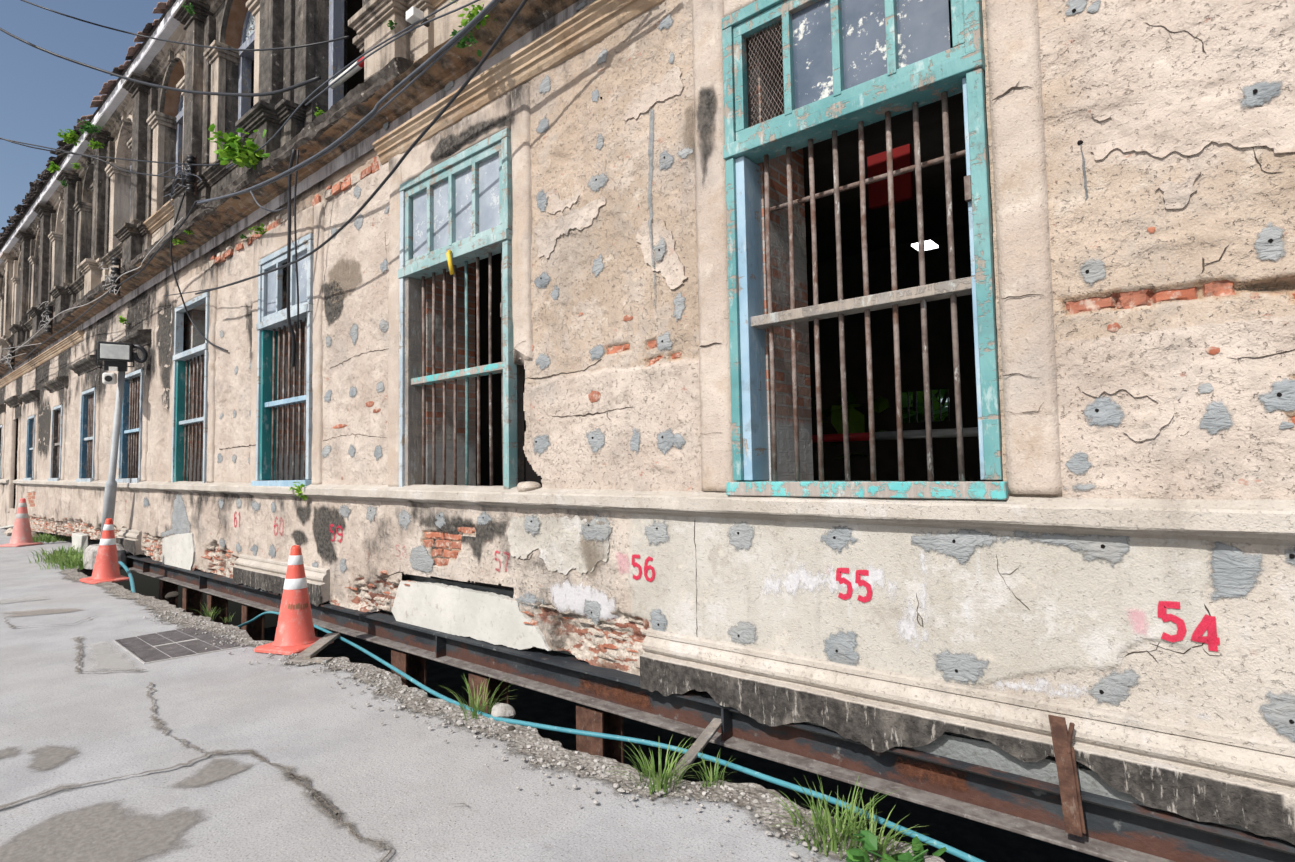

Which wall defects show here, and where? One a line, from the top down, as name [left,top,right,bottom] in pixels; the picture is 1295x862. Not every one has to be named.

water stain [685,88,716,174]
water stain [322,260,361,325]
flaking render [1065,280,1295,332]
crack [1228,349,1295,359]
spalling [517,456,542,492]
water stain [292,506,345,564]
flaking render [423,526,475,566]
peeling [507,515,613,575]
crack [1124,604,1220,660]
rust [580,680,651,709]
crack [0,615,392,862]
rust [897,758,967,792]